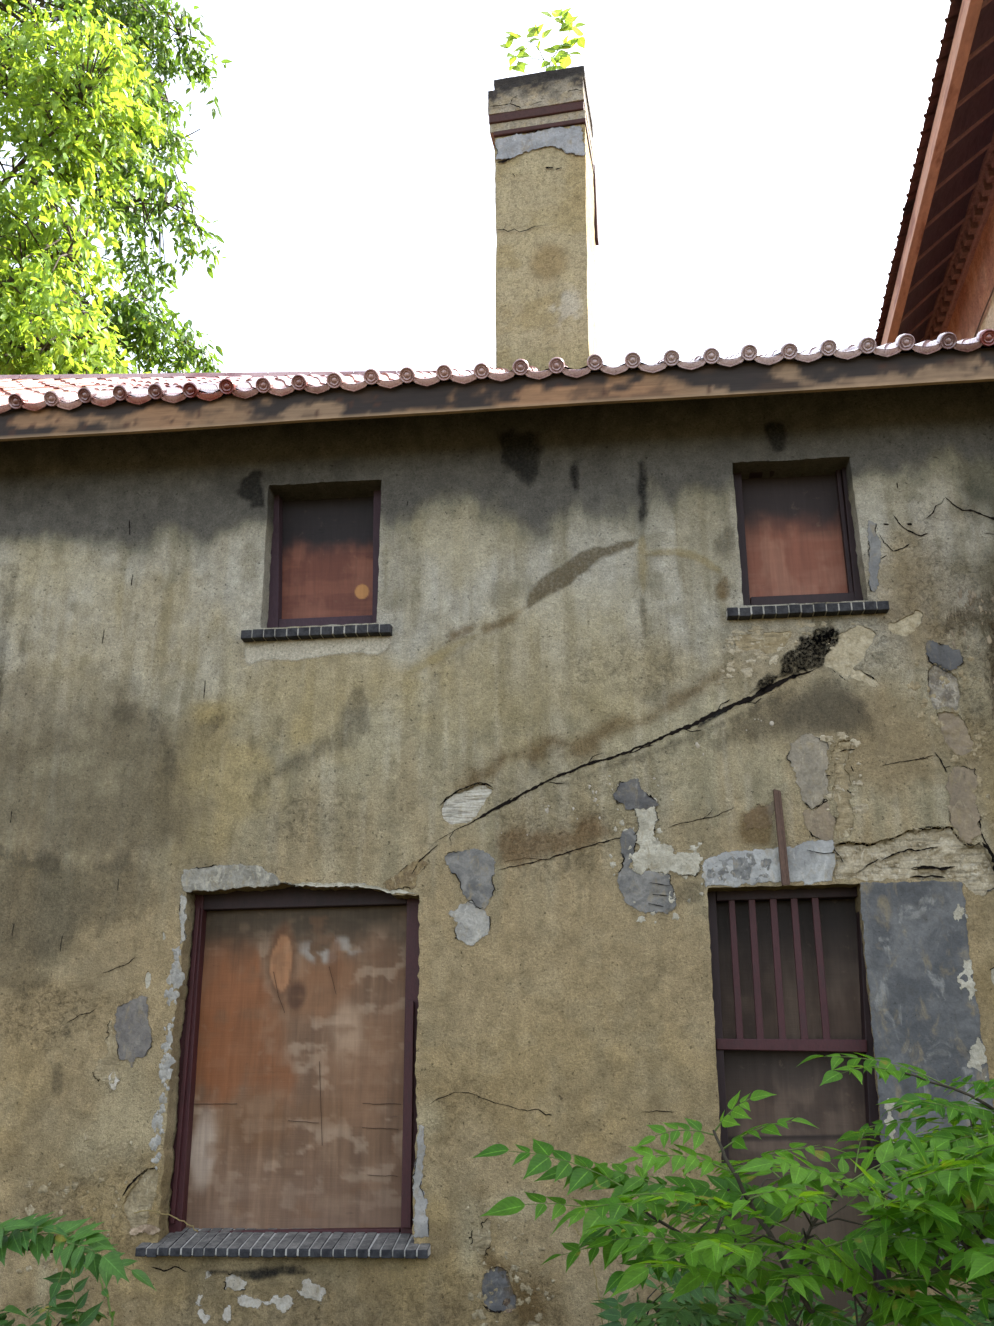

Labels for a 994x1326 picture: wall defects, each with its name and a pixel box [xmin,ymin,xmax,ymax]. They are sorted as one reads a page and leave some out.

leakage [765,422,786,451]
leakage [638,464,647,518]
crack [868,483,994,591]
leakage [528,541,634,606]
efflorescence [245,636,390,664]
spalling [441,782,493,825]
crack [412,669,815,939]
crack [806,799,837,854]
spalling [815,732,994,896]
spalling [290,859,427,894]
peeling [25,932,185,1237]
crack [430,1092,551,1116]